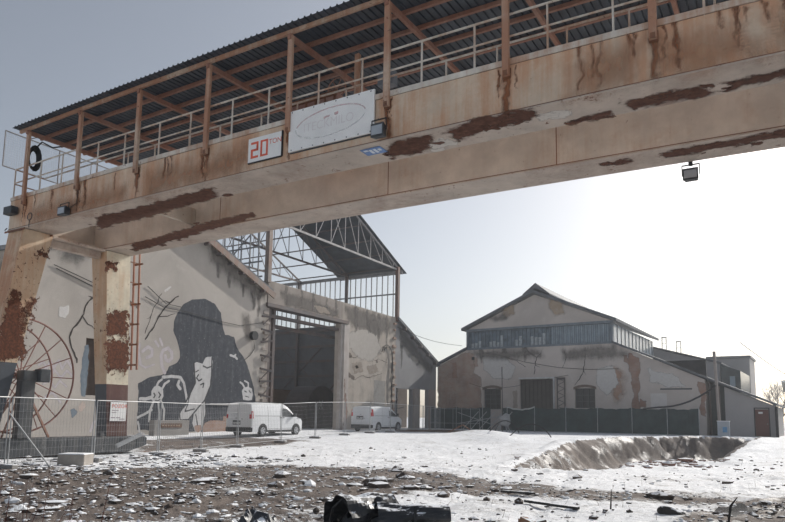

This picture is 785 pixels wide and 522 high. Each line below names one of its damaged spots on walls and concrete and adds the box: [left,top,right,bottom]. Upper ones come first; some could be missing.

rust [650,6,747,78]
rust [382,66,539,160]
rust [626,69,785,110]
rust [660,129,785,158]
rust [21,149,247,230]
rust [130,212,256,251]
crack [69,296,94,363]
peeling [596,366,618,394]
spalling [623,353,685,409]